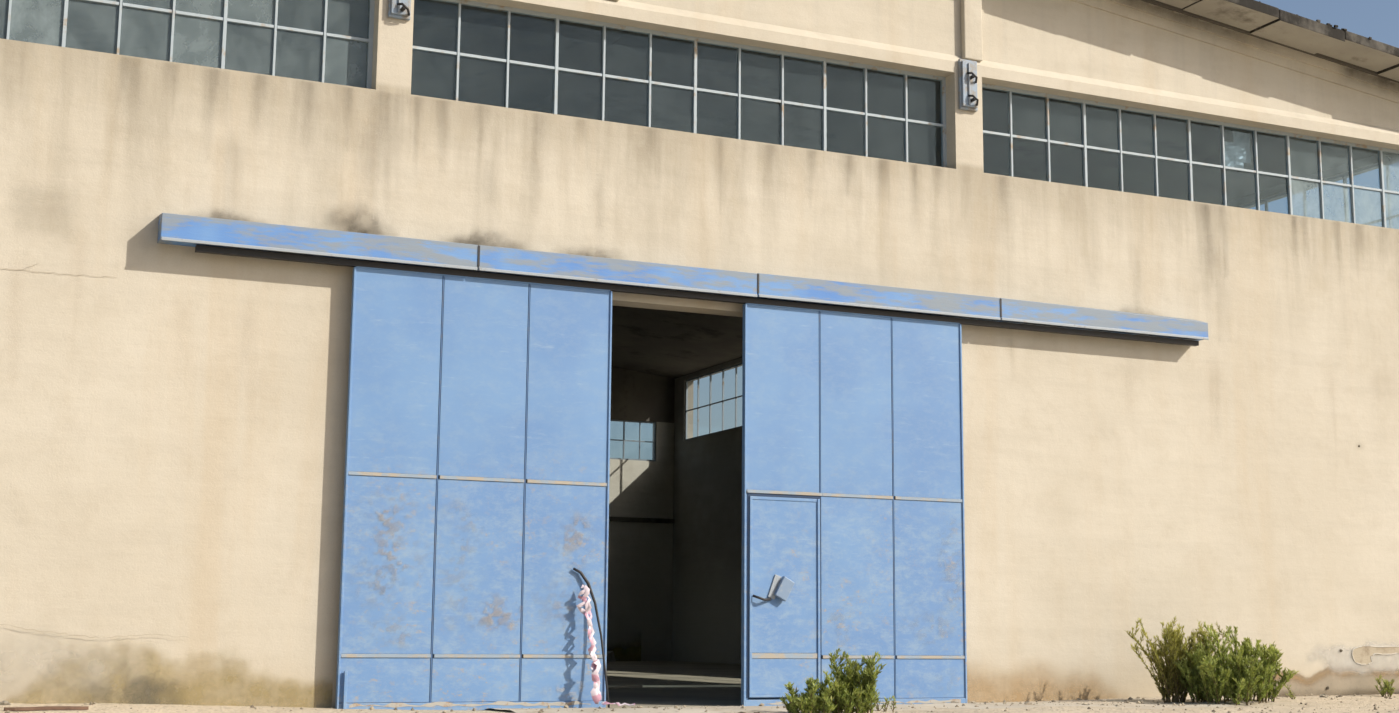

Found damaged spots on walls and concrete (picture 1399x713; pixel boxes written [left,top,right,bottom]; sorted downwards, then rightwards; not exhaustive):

leakage [9,655,333,708]
flaking render [1252,646,1399,697]